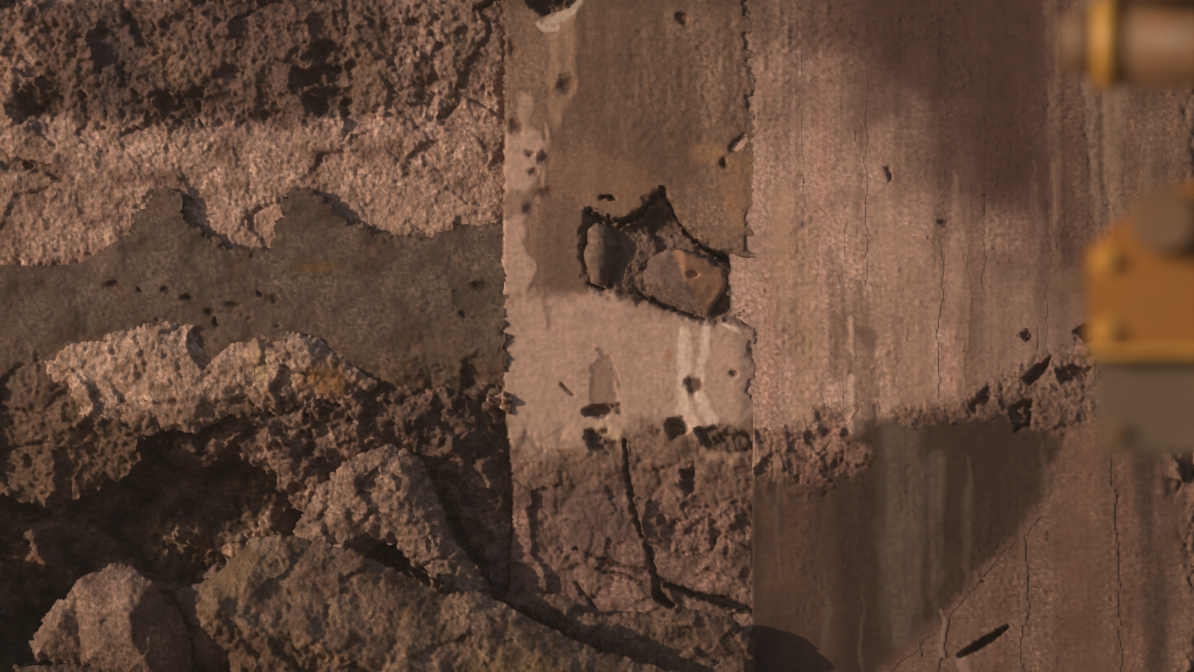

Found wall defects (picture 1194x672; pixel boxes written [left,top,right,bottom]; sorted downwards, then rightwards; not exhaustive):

spalling [741,0,753,109]
flaking render [465,115,881,490]
water stain [673,323,743,436]
water stain [699,0,1178,672]
spalling [884,323,1098,441]
crack [574,438,753,615]
spalling [653,462,752,562]
water stain [1109,453,1194,672]